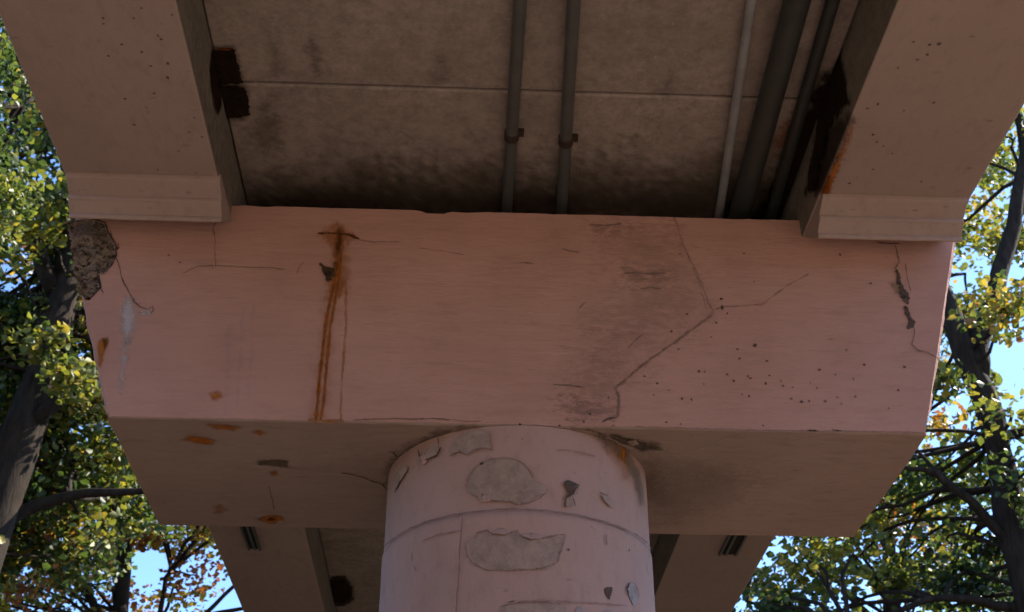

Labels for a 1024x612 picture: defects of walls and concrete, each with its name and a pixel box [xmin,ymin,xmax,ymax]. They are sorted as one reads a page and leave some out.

spalling [66,219,118,298]
crack [114,255,154,314]
rust [98,338,108,366]
rust [308,229,360,422]
crack [602,290,922,433]
peeling [564,480,579,508]
peeling [465,528,570,571]